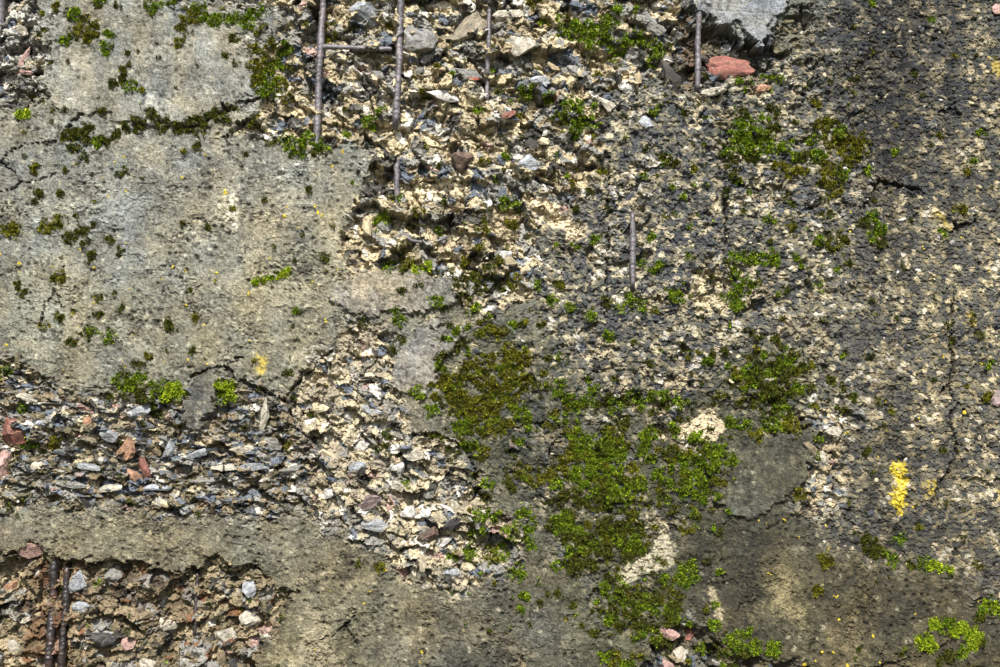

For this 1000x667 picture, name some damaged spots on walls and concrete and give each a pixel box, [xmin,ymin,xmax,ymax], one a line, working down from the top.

spalling [0,0,816,605]
spalling [0,517,65,667]
rust [13,549,211,667]
spalling [68,553,300,667]
peeling [288,597,342,667]
spalling [638,577,812,667]
peeling [746,562,809,632]